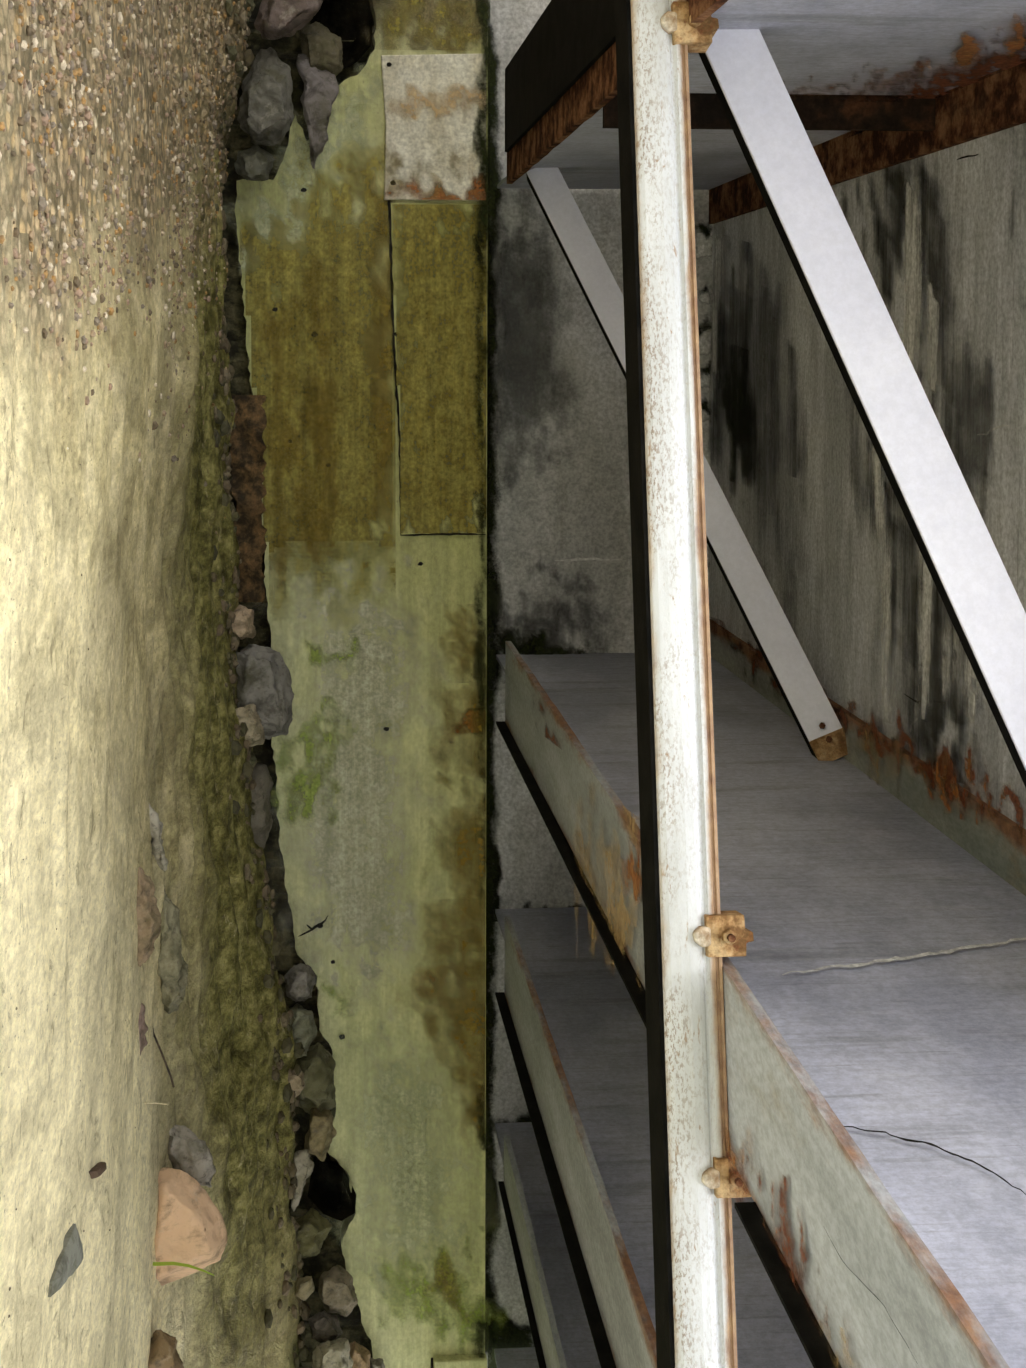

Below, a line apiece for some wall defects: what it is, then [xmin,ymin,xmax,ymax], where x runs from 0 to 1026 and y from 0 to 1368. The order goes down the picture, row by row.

corrosion [855,16,1026,102]
corrosion [387,158,486,200]
damp [708,227,797,545]
damp [843,160,990,492]
corrosion [710,617,782,696]
damp [855,436,979,784]
corrosion [823,688,1024,834]